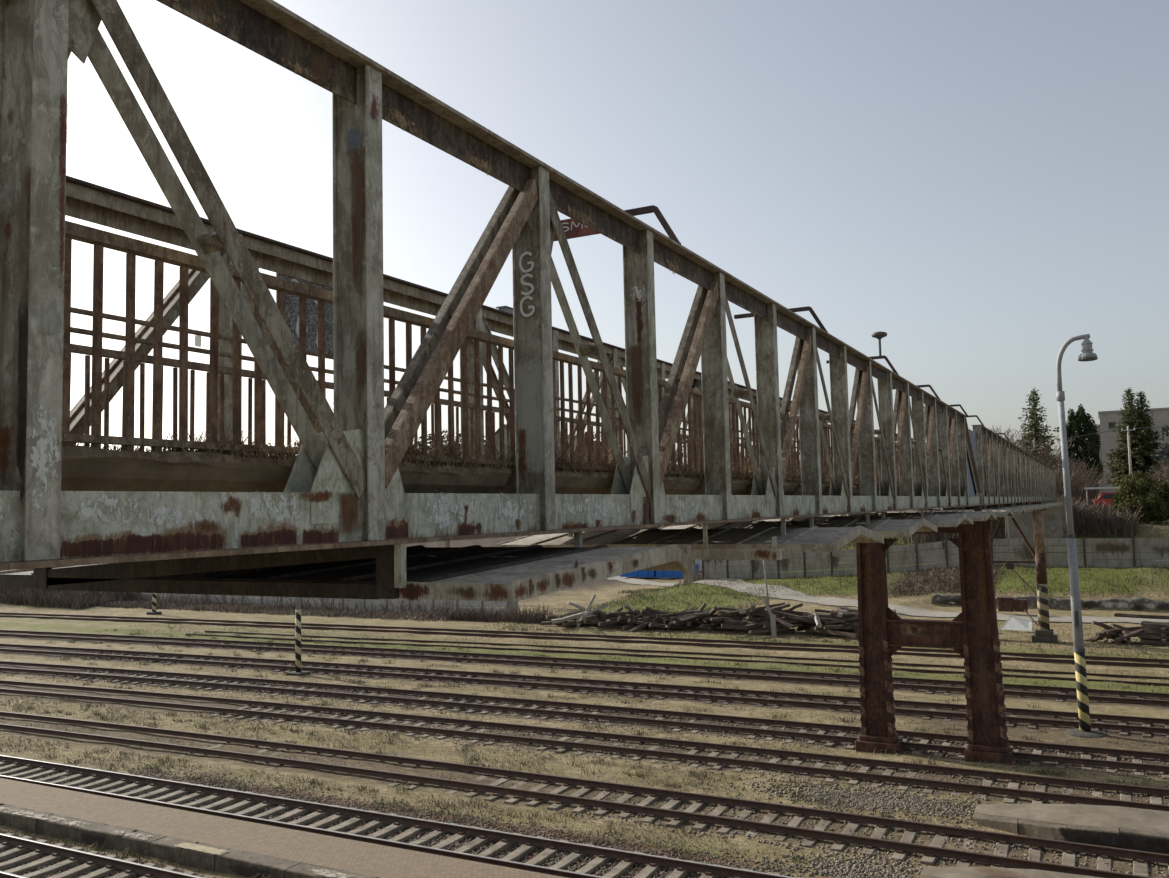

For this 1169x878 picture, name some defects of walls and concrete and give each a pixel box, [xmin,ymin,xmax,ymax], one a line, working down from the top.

corrosion [281,56,323,83]
peeling [28,402,217,526]
corrosion [60,490,361,558]
corrosion [458,505,483,535]
corrosion [399,583,429,601]
corrosion [454,560,596,601]